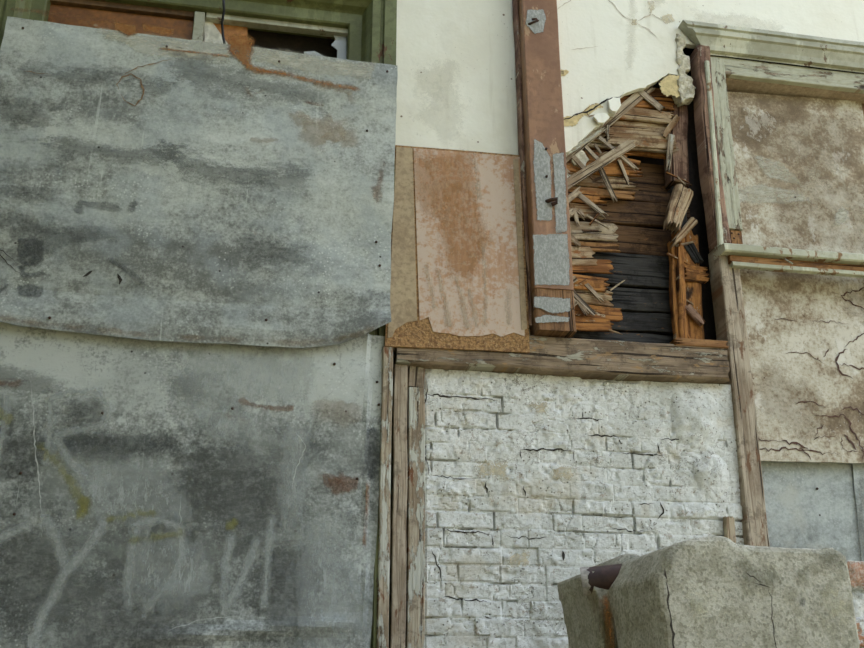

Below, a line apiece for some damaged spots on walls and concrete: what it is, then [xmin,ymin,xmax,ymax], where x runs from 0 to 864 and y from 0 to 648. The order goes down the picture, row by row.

crack [608,0,662,34]
corrosion [161,34,358,90]
flaking render [564,34,712,344]
crack [773,287,864,379]
crack [425,384,494,403]
crack [425,446,488,492]
crack [520,448,574,459]
crack [575,412,679,456]
crack [758,401,864,462]
crack [447,529,544,545]
crack [614,503,664,532]
crack [431,549,492,619]